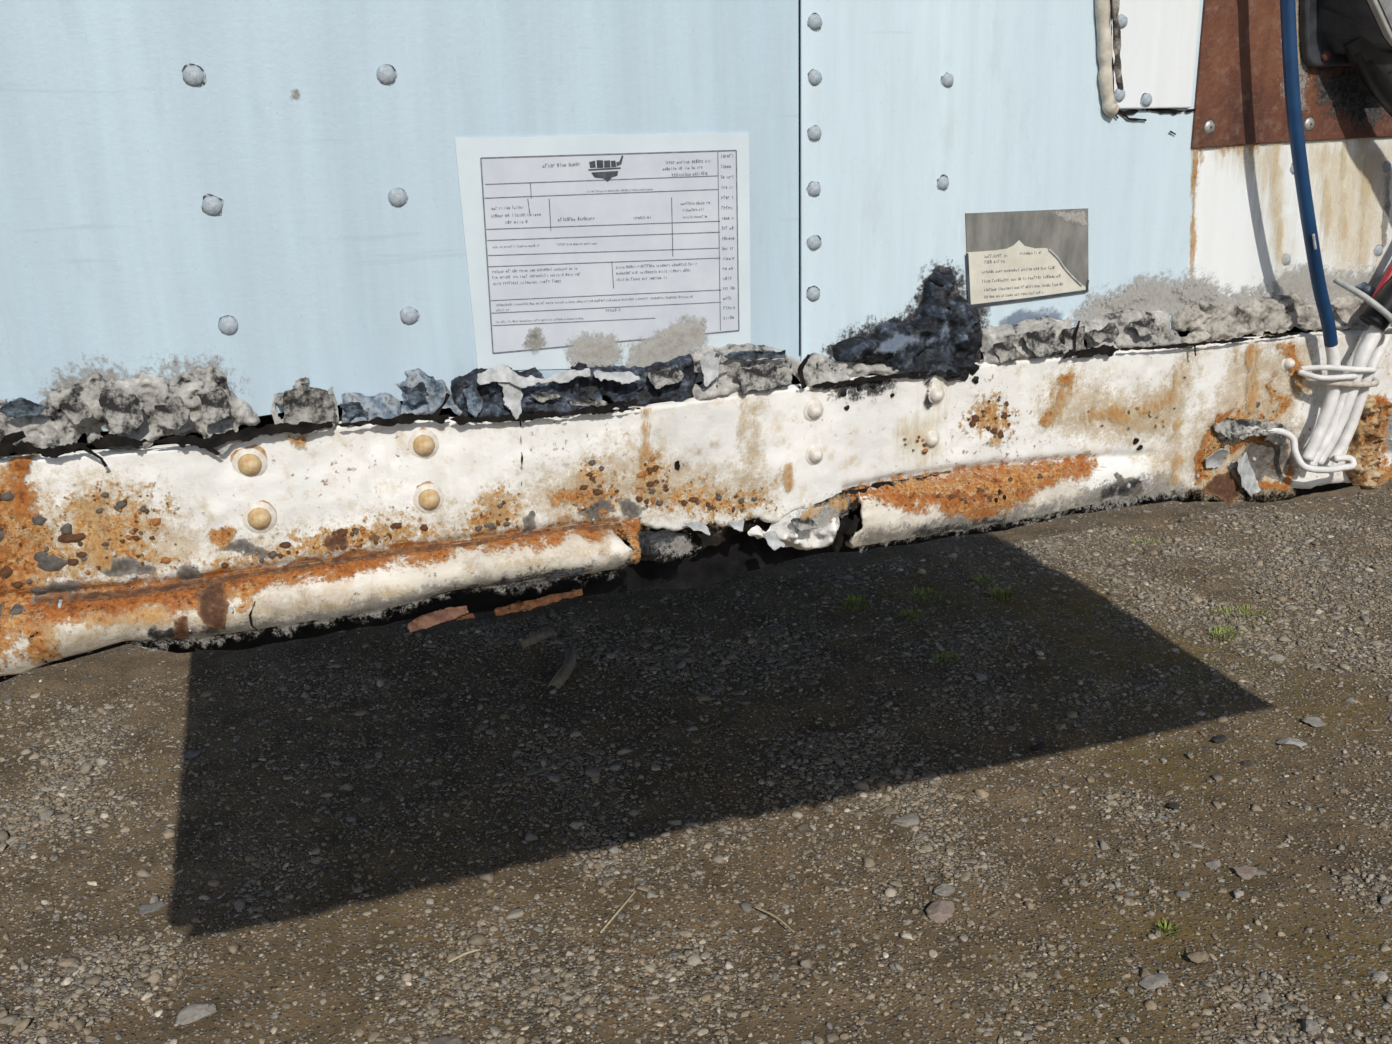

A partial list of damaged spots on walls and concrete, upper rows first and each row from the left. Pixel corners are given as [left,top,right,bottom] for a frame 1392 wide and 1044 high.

peeling [1063,318,1160,354]
peeling [0,397,92,425]
peeling [154,390,231,430]
peeling [498,382,607,420]
peeling [593,367,684,389]
peeling [700,350,786,387]
corrosion [923,377,933,409]
corrosion [1039,368,1077,426]
corrosion [1081,364,1186,450]
corrosion [1169,339,1312,492]
corrosion [1345,394,1392,490]
corrosion [0,408,1098,674]